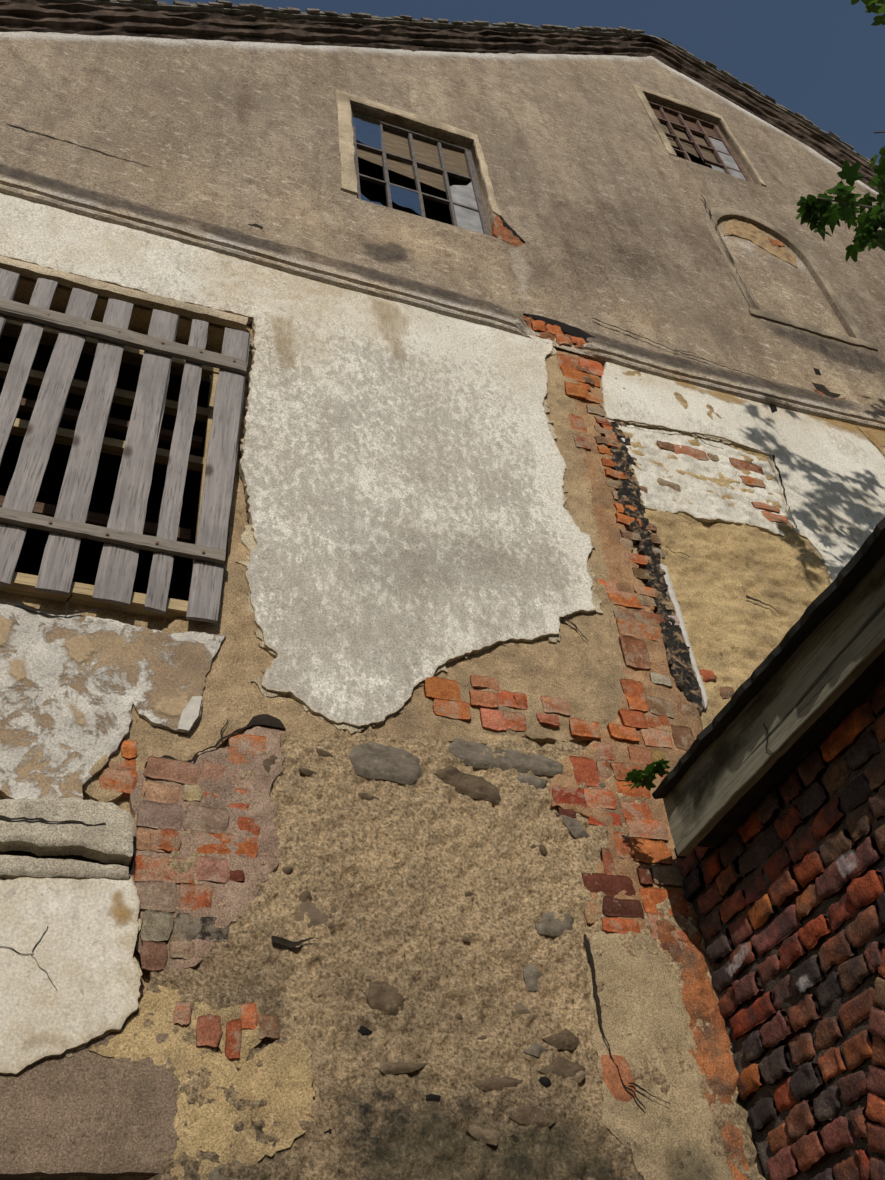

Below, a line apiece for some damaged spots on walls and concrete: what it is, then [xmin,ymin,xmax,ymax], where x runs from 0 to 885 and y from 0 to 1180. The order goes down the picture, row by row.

flaking render [491,215,525,247]
flaking render [0,313,829,1180]
crack [0,926,58,992]
crack [583,934,670,1109]